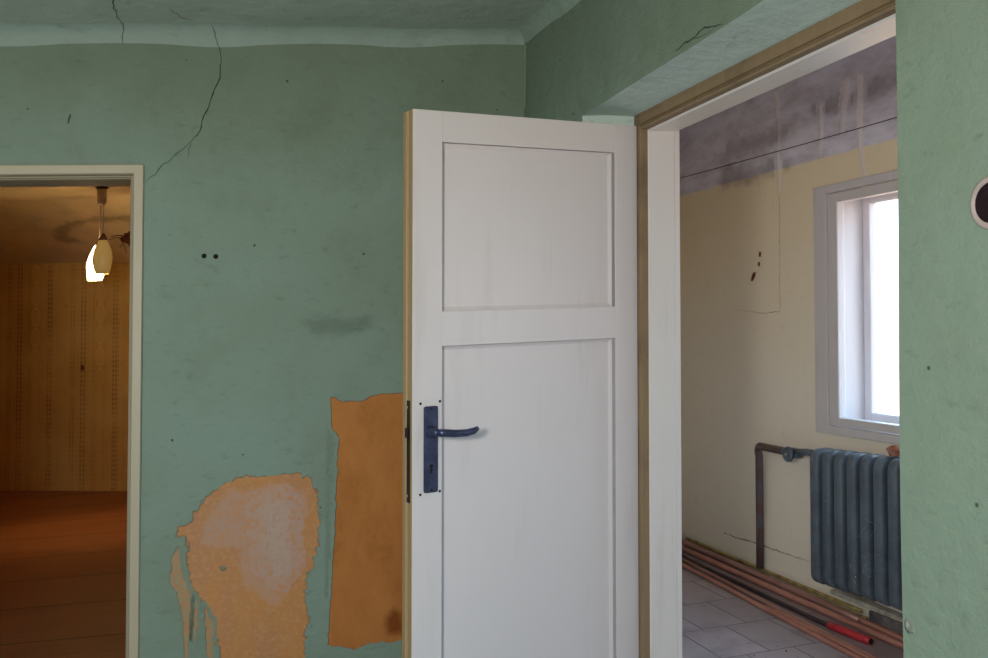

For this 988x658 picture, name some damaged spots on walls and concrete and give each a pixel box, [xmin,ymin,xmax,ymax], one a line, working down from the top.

crack [148,11,222,179]
leakage [816,66,871,188]
peeling [166,389,403,658]